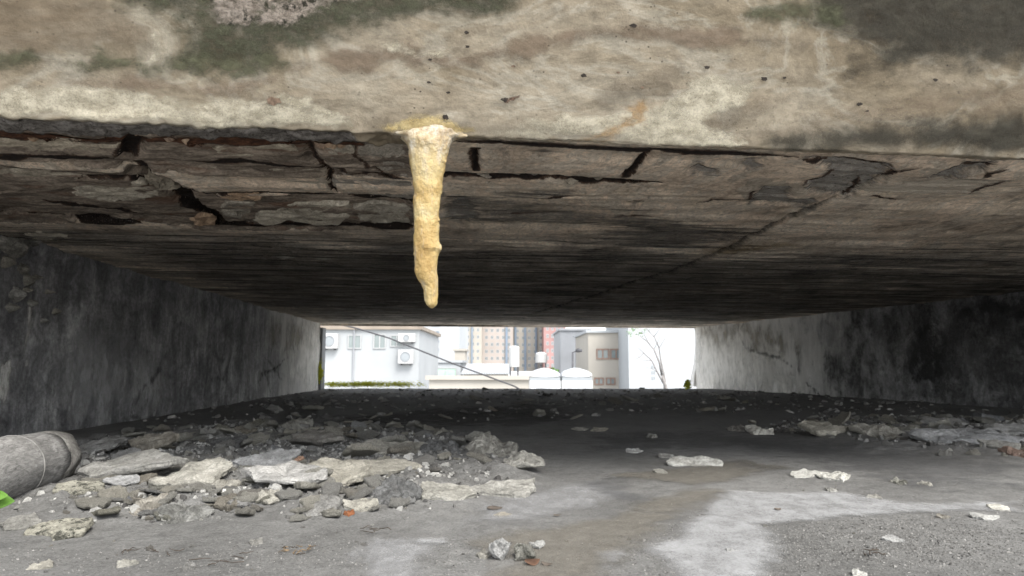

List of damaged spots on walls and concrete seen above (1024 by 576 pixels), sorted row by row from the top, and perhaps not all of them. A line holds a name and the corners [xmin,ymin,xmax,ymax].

leakage [325,43,418,72]
leakage [625,26,744,48]
leakage [0,78,346,129]
leakage [386,116,471,133]
leakage [510,76,751,148]
spalling [0,117,414,240]
crack [616,148,659,217]